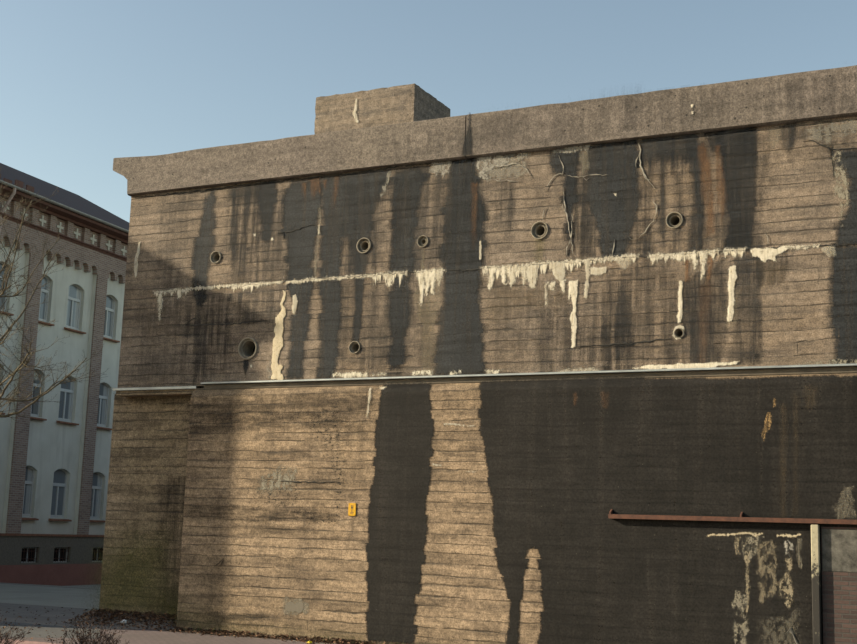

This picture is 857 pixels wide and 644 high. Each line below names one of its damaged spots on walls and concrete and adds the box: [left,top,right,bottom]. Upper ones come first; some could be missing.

crack [142,140,857,293]
leakage [154,114,857,644]
peeling [732,535,802,644]